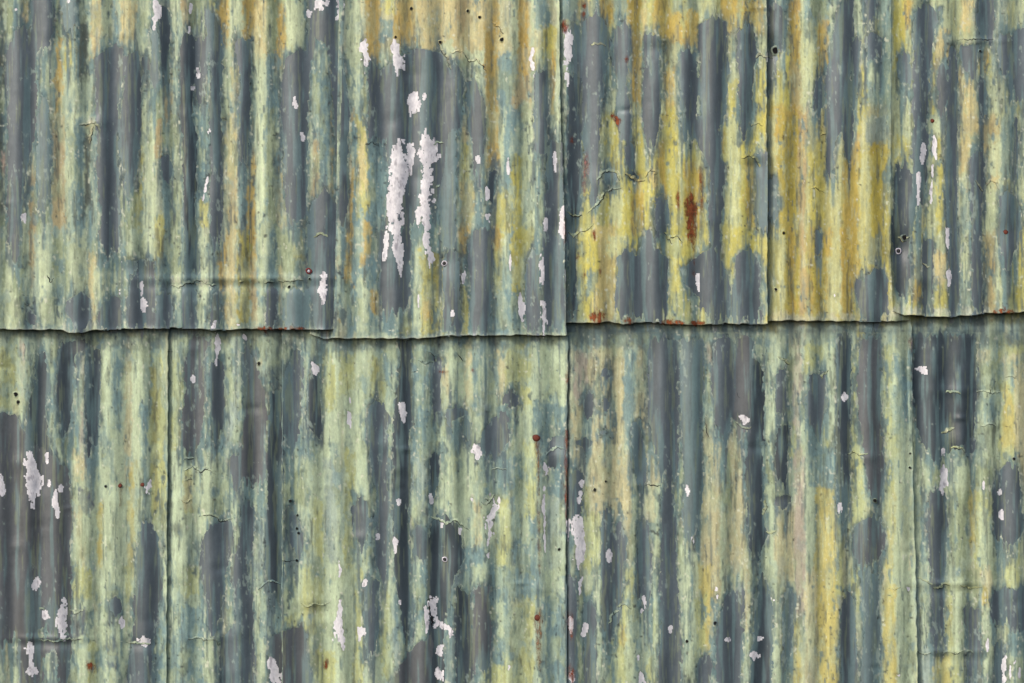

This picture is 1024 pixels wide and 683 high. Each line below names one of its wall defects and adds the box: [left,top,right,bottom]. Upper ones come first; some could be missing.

peeling [0,0,324,683]
peeling [332,599,345,651]
peeling [351,336,493,683]
peeling [359,38,510,342]
peeling [484,493,501,558]
peeling [518,8,662,342]
peeling [541,2,797,683]
corrosion [676,176,703,249]